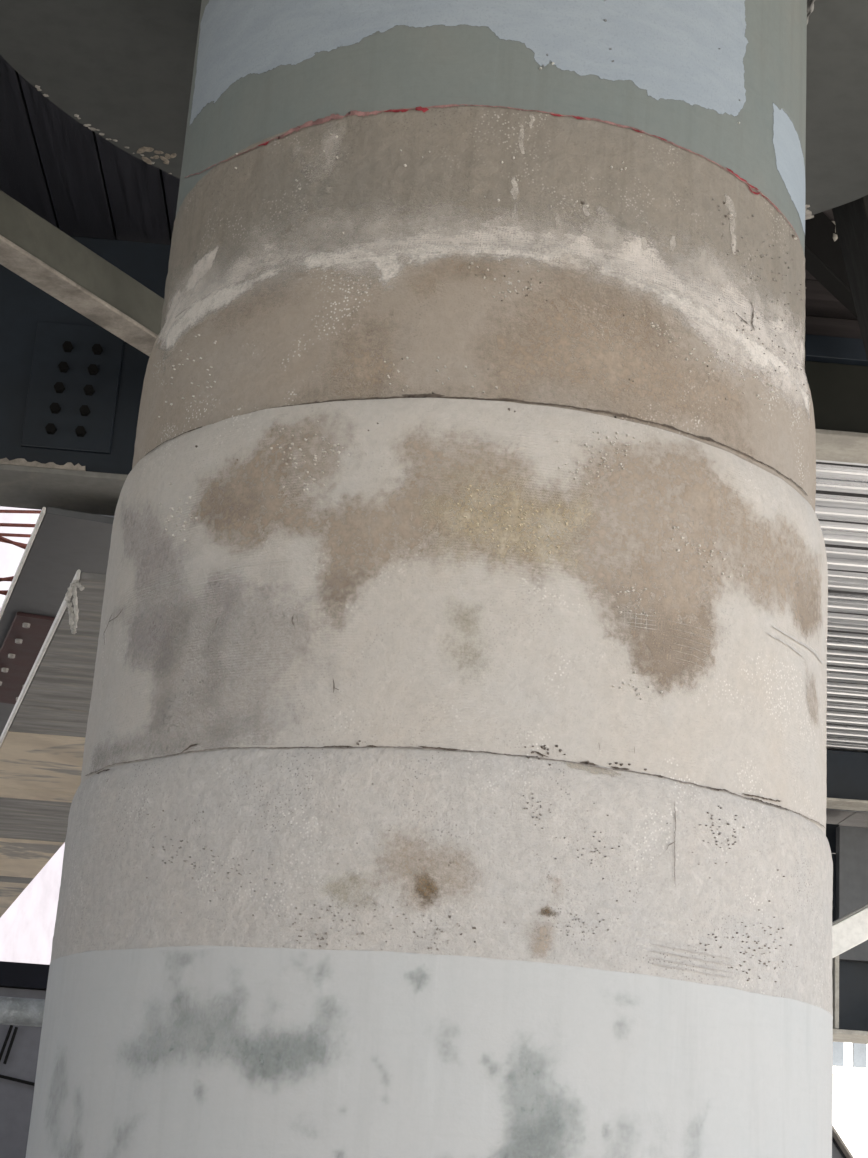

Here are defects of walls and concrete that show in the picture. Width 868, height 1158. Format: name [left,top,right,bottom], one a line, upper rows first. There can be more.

damp [182,246,219,300]
damp [670,195,741,300]
damp [195,429,819,686]